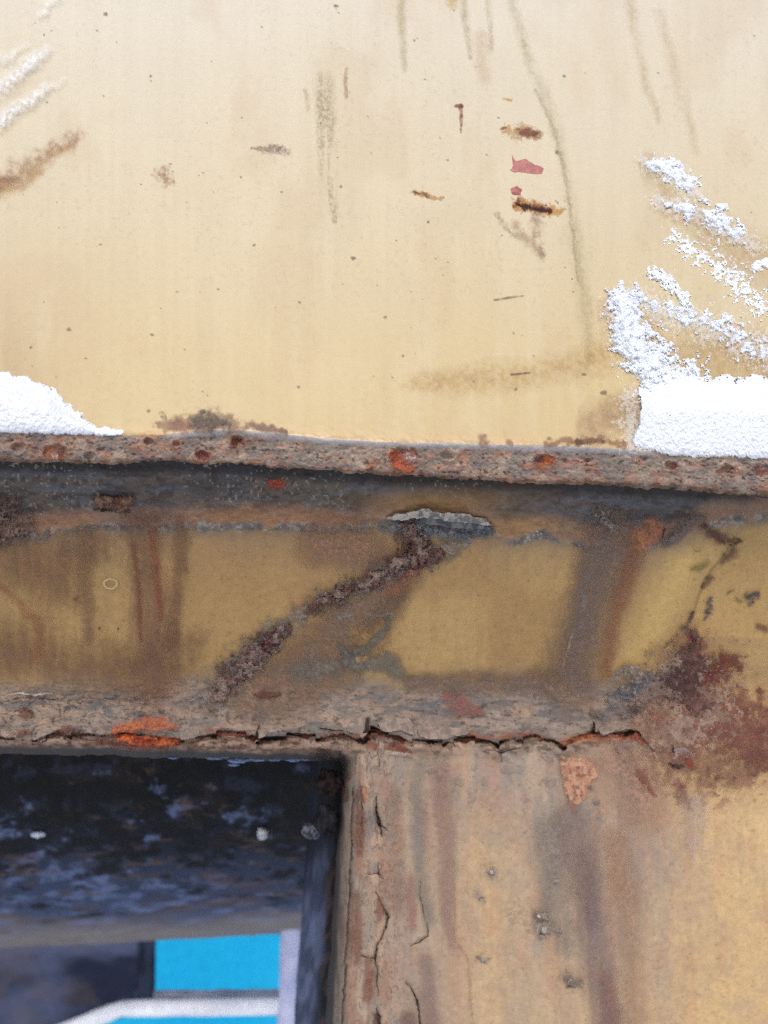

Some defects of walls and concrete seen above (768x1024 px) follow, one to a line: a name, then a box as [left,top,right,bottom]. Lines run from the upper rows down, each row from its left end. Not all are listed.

rust [501,125,540,139]
rust [513,197,563,220]
rust [155,409,287,435]
rust [544,417,627,448]
peeling [374,508,496,580]
rust [228,525,419,717]
rust [95,715,181,750]
crack [0,716,652,784]
rust [549,622,768,824]
crack [341,788,389,1024]
crack [411,885,429,946]
crack [406,982,421,1024]